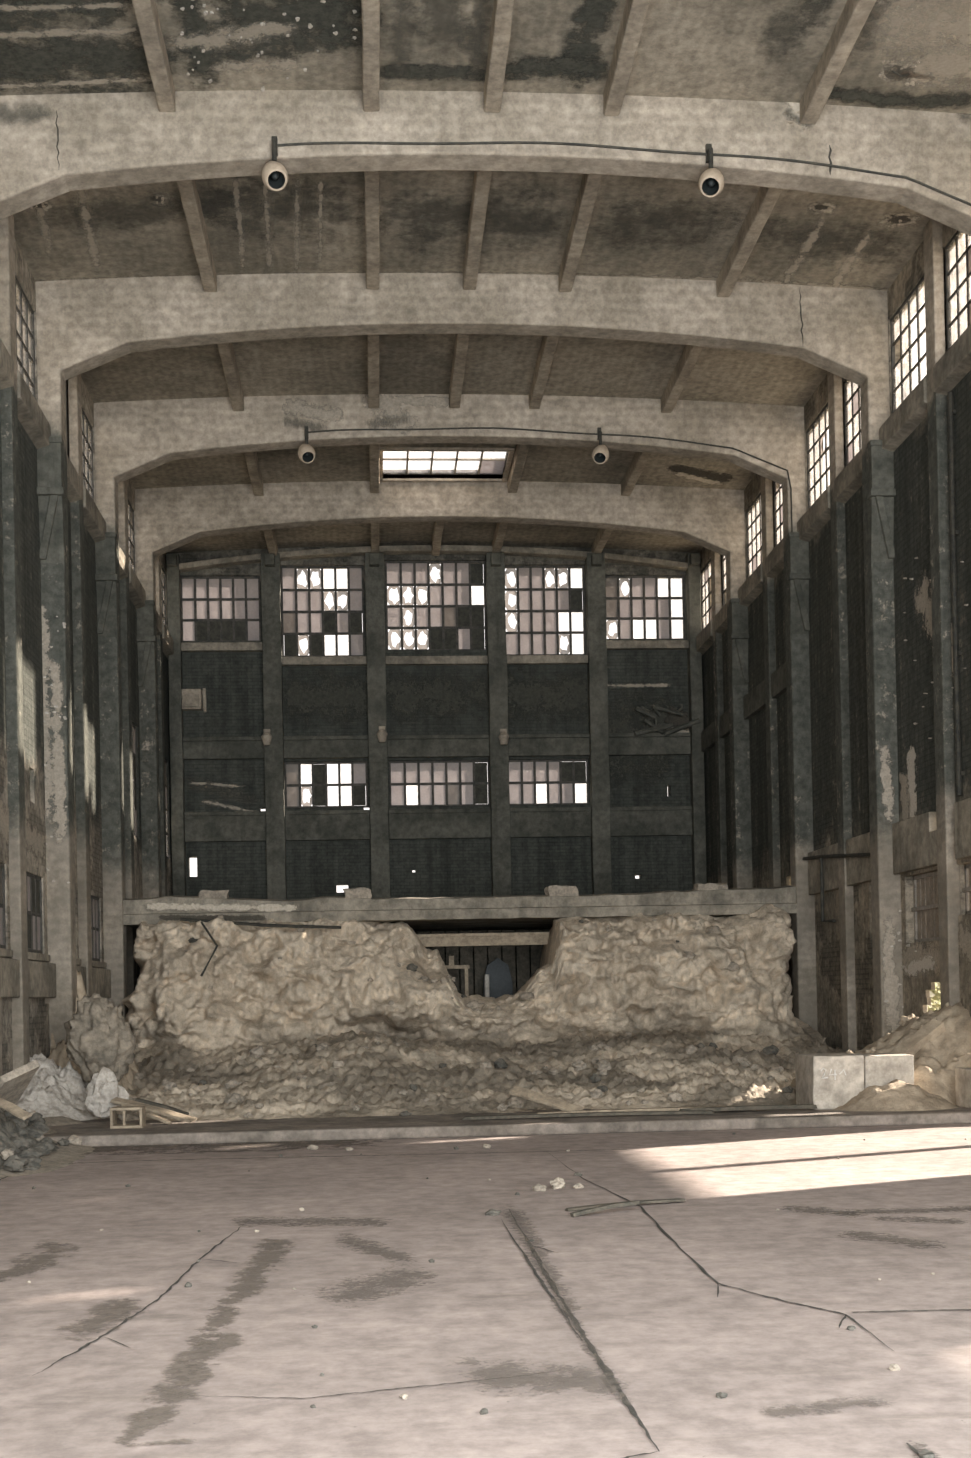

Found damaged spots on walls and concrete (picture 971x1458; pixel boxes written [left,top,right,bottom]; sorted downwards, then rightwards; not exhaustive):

leakage [0,2,125,12]
leakage [0,27,137,38]
leakage [0,78,146,89]
leakage [828,0,971,109]
flaking render [882,910,940,1032]
crack [32,1220,250,1376]
crack [195,1209,659,1458]
crack [69,1149,971,1351]
crack [906,1443,935,1458]